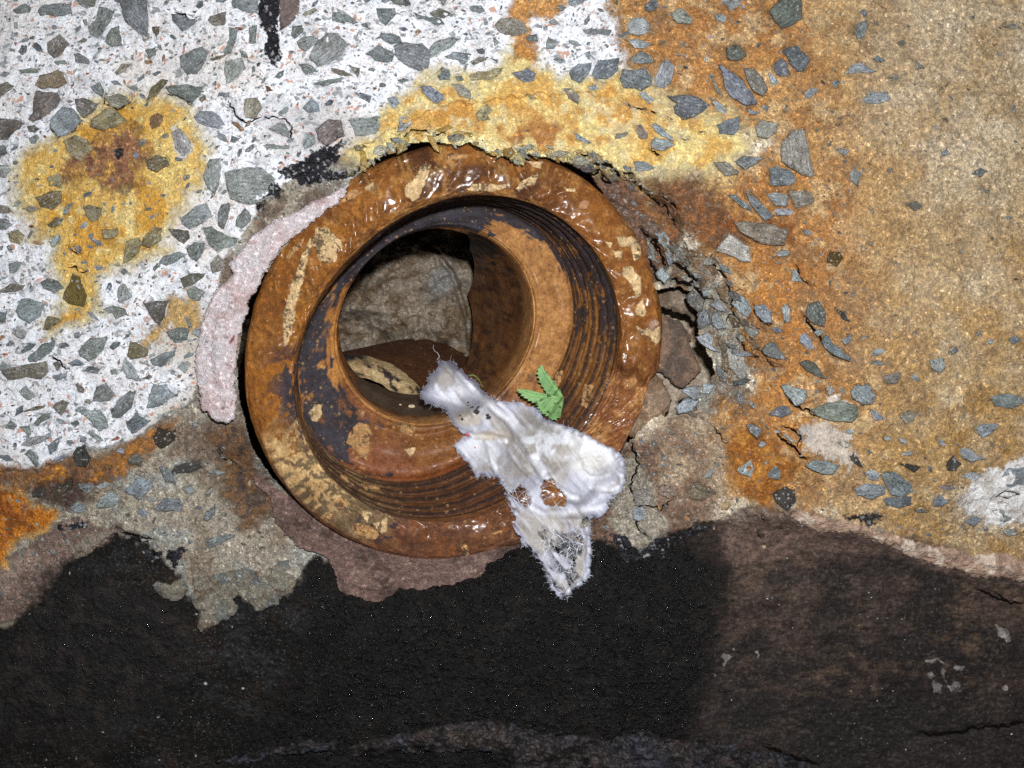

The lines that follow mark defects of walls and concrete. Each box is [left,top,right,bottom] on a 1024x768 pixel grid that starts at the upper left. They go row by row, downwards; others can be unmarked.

rust [10,94,211,338]
spalling [597,231,760,387]
rust [344,0,1024,558]
rust [0,424,174,569]
rust [207,422,274,531]
water stain [791,510,1024,582]
water stain [958,457,1024,528]
water stain [0,579,192,740]
water stain [262,524,734,768]
water stain [995,624,1010,642]